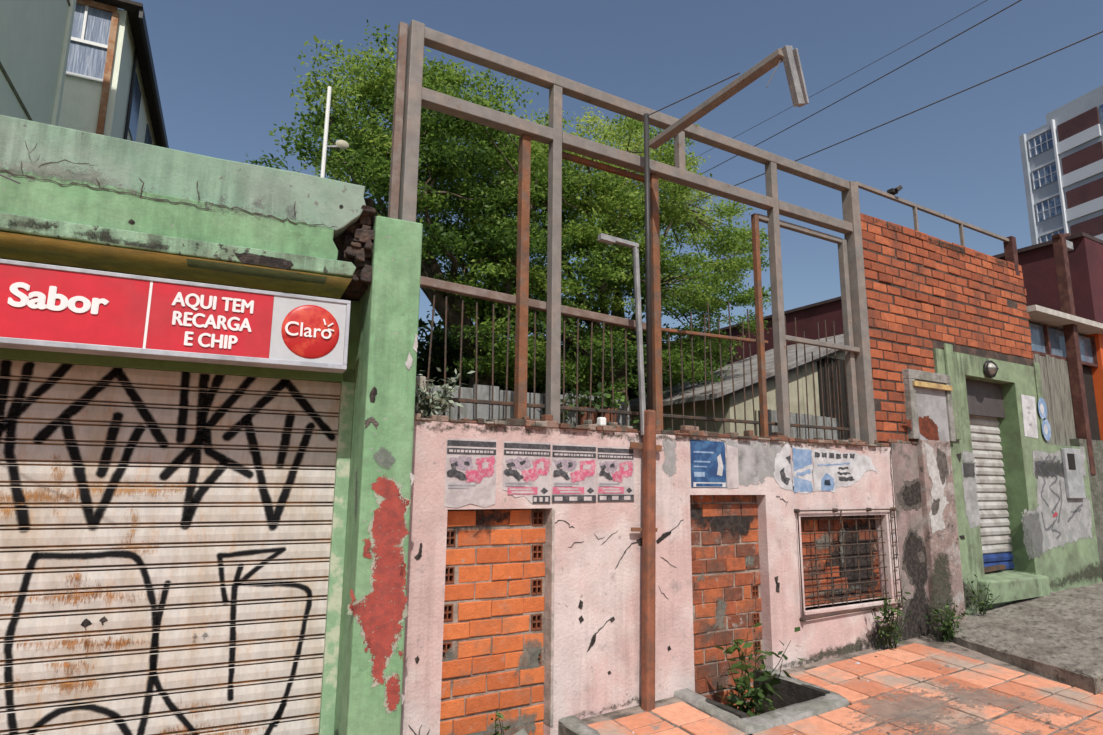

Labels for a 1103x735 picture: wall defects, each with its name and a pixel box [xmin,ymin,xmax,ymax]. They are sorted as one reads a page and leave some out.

crack [0,141,338,228]
spalling [343,198,376,285]
peeling [405,334,418,370]
rust [23,456,191,503]
crack [551,520,638,569]
rust [30,573,127,605]
peeling [347,473,423,714]
leakage [927,553,980,635]
leakage [1051,561,1103,587]
rust [15,635,142,654]
rust [5,661,96,691]
rust [160,725,259,735]